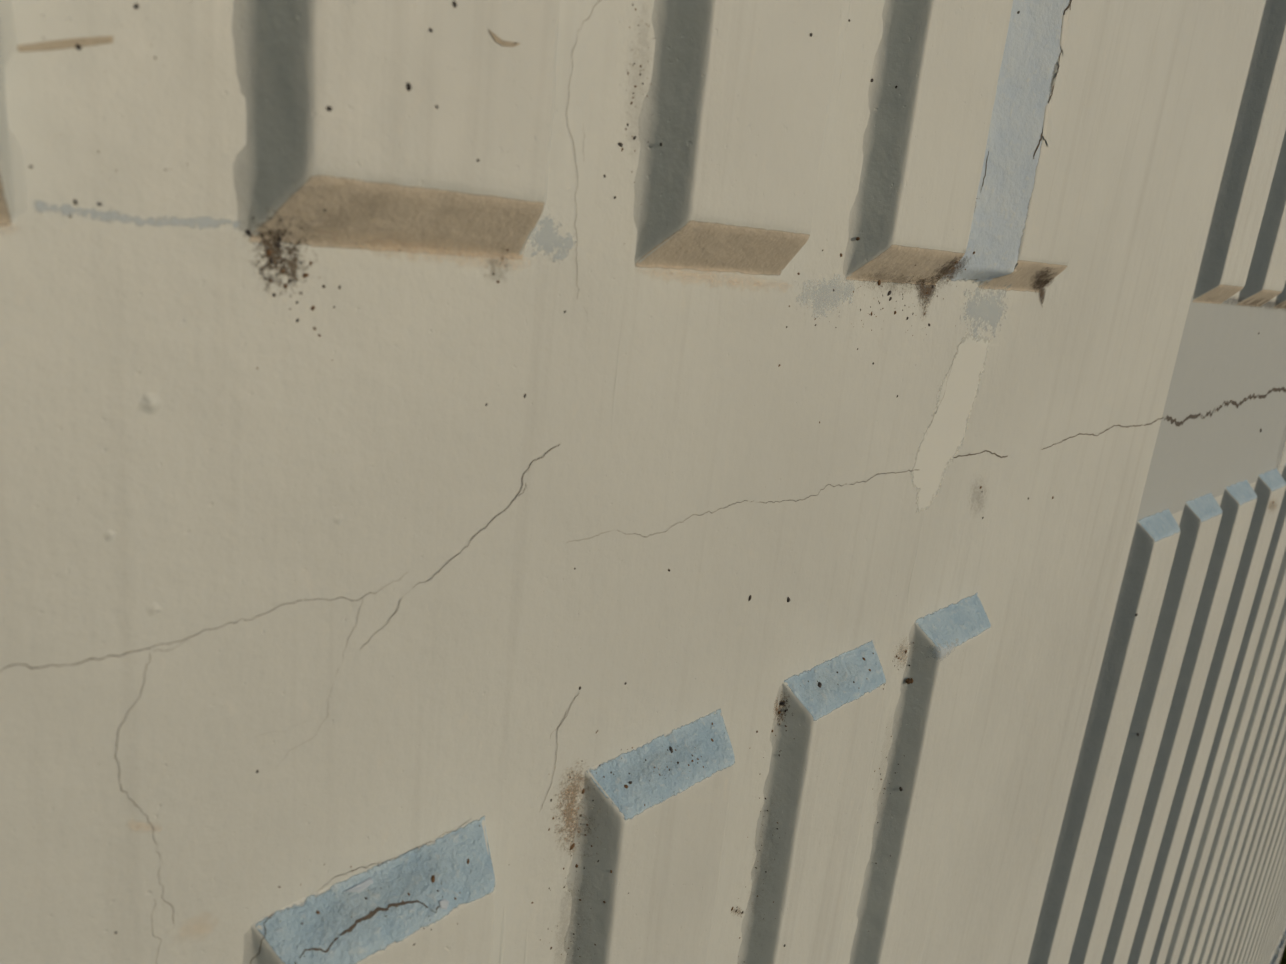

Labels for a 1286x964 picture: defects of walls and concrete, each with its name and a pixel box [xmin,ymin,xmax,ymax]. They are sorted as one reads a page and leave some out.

peeling [1033,0,1072,159]
crack [954,450,1008,458]
crack [1041,387,1286,450]
crack [1,444,560,964]